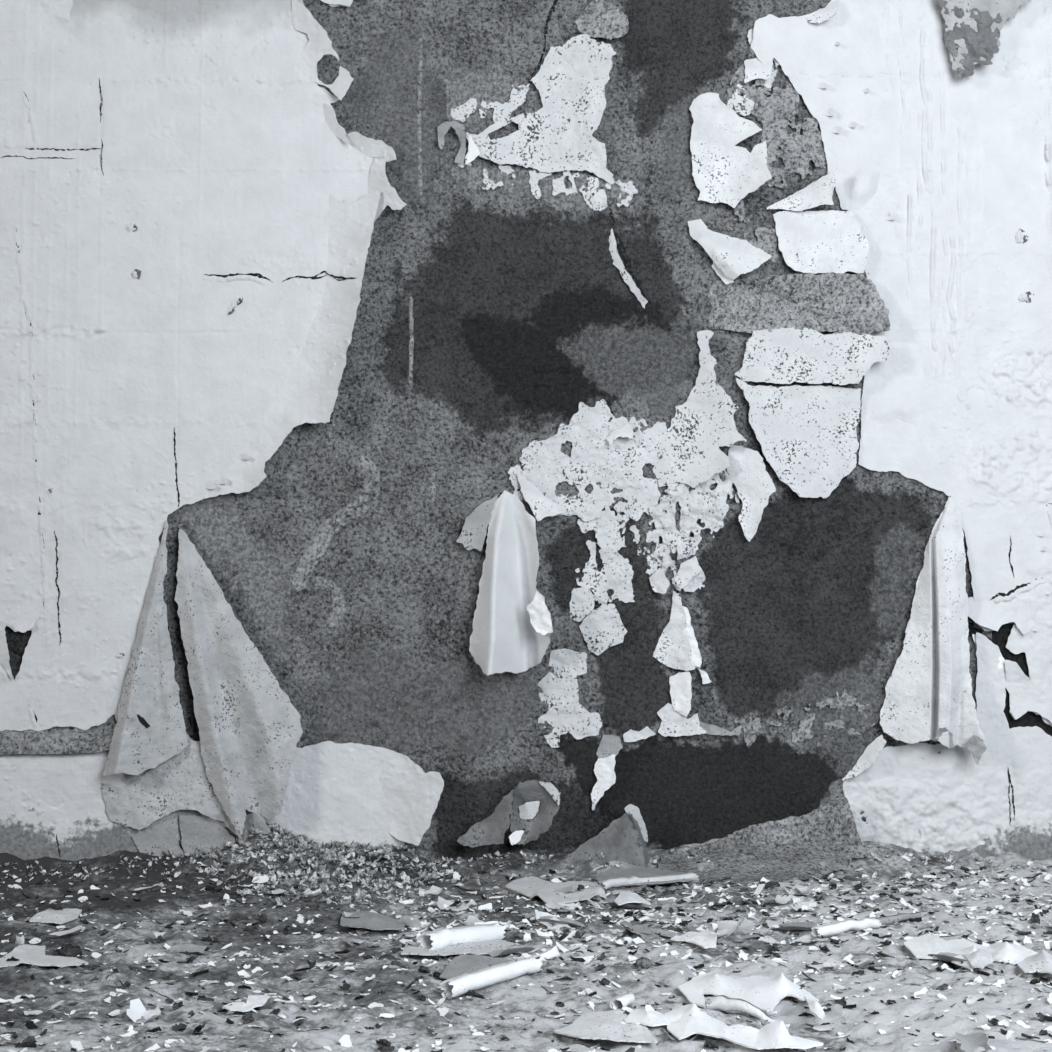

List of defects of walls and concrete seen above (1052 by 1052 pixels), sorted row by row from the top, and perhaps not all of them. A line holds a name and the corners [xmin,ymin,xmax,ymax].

crack [1,78,104,176]
crack [201,271,355,286]
peeling [101,0,1034,862]
peeling [0,617,40,679]